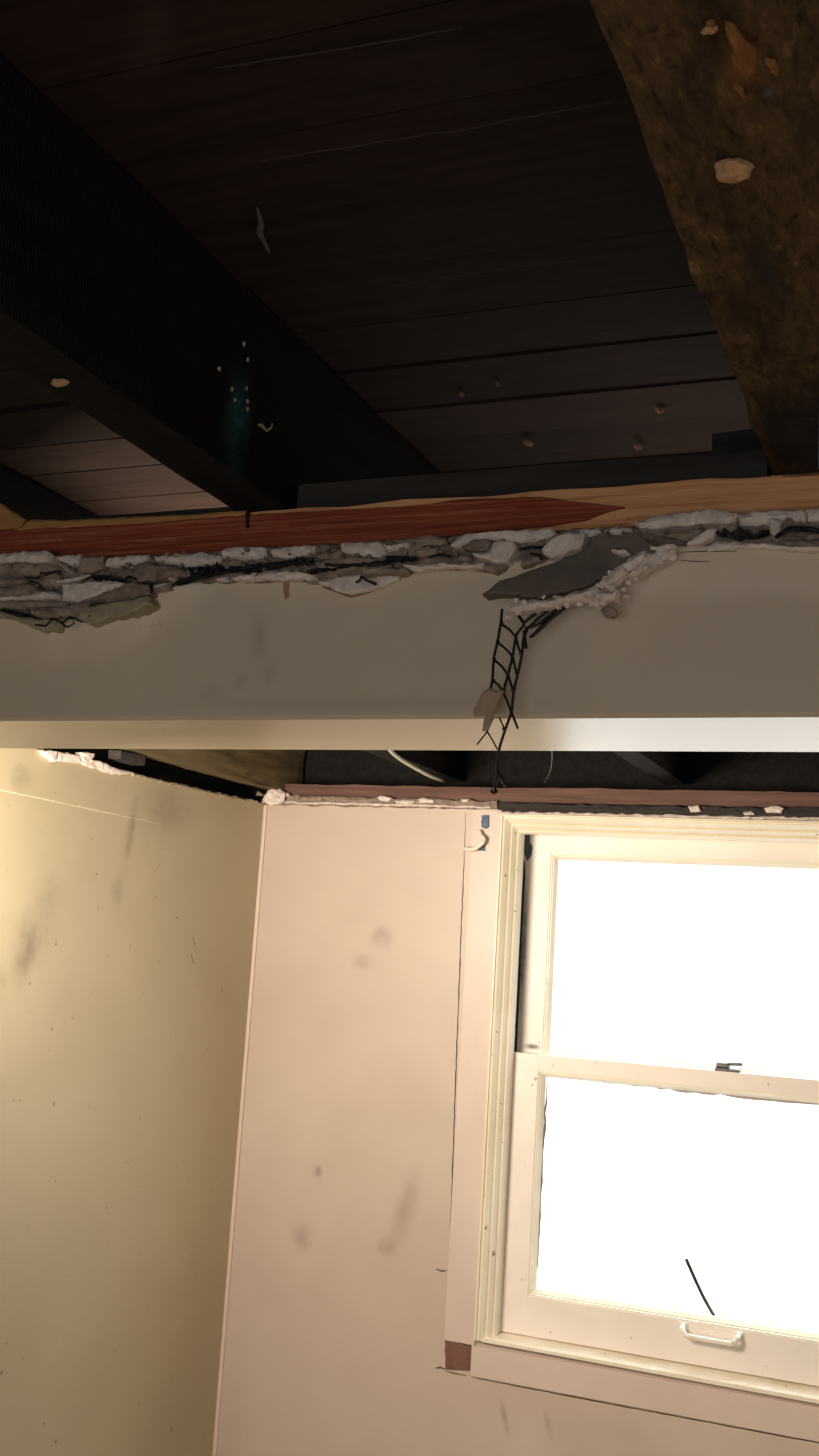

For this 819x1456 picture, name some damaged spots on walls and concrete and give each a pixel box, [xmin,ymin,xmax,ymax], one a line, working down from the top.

crack [215,28,463,69]
crack [260,101,613,161]
spalling [0,508,819,634]